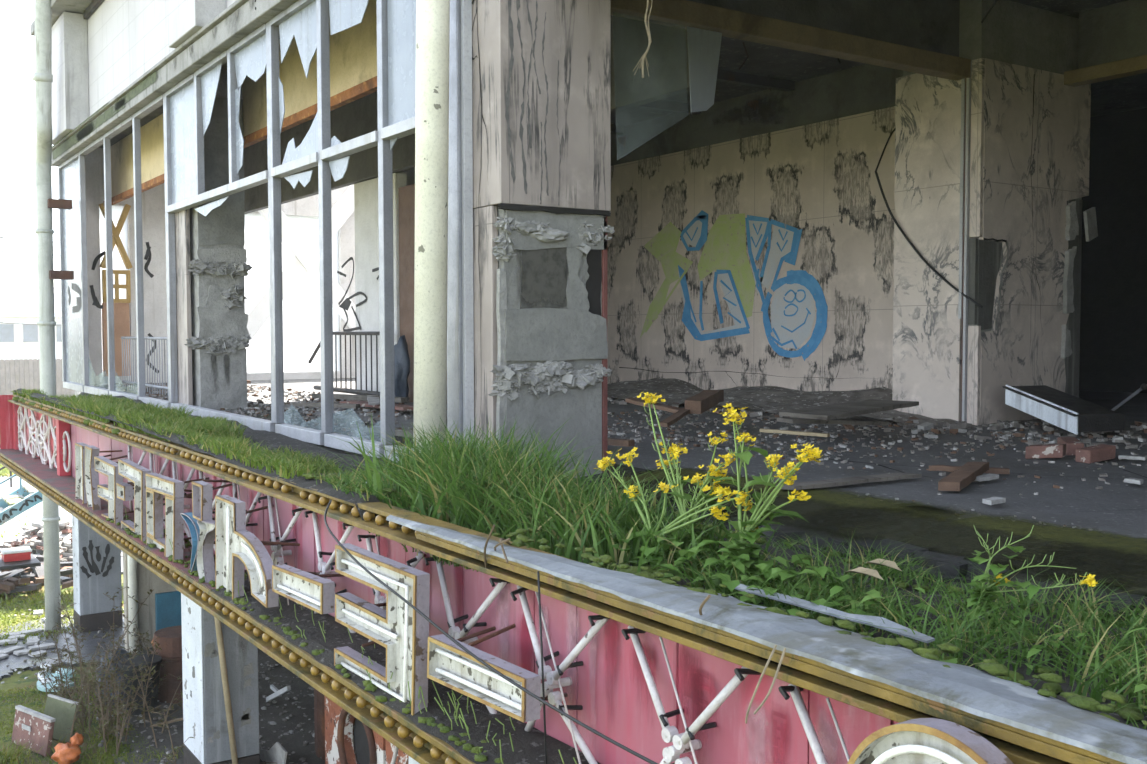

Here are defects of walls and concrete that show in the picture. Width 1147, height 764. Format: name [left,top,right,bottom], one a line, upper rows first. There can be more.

damp [505,0,561,205]
spalling [185,97,253,410]
spalling [488,203,678,519]
spalling [700,513,739,532]
damp [624,477,1147,593]
spalling [774,531,1027,602]
spalling [1038,581,1147,627]